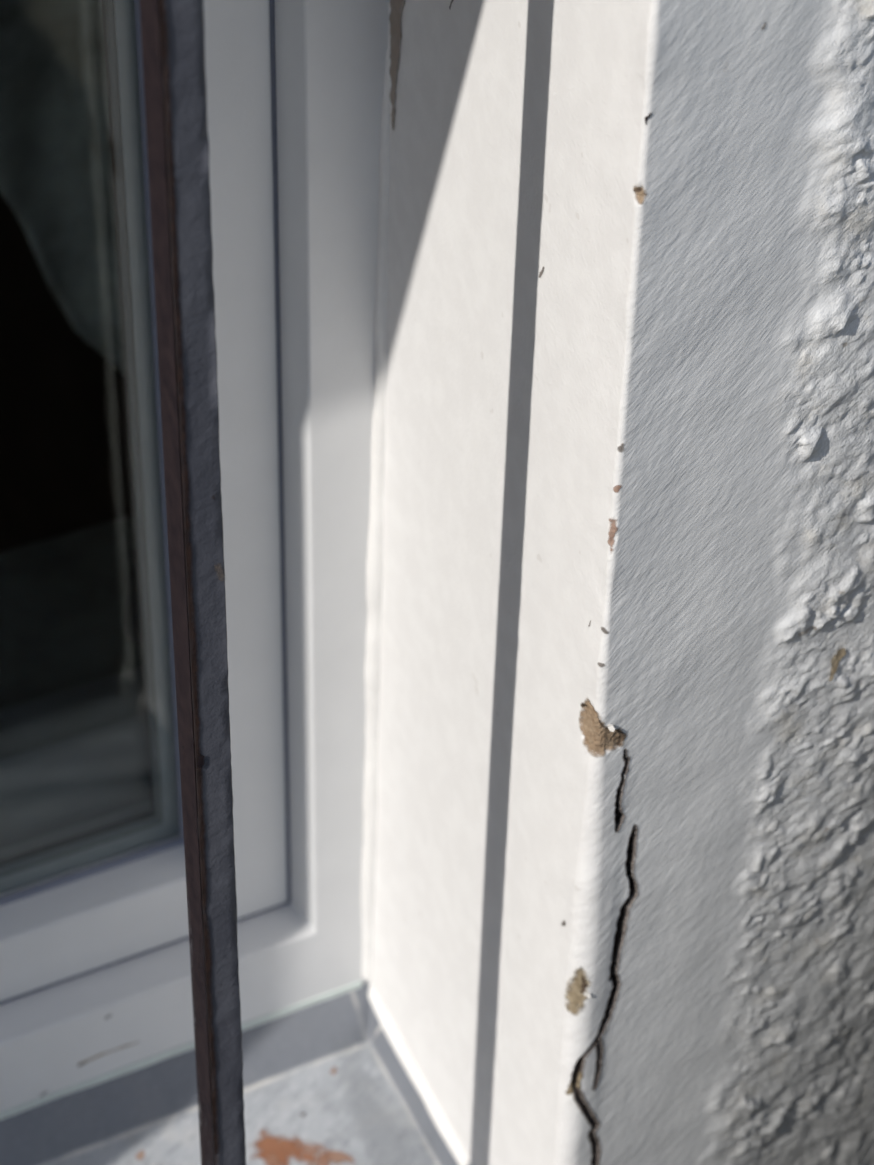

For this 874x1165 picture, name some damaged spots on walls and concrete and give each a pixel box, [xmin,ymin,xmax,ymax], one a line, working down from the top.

peeling [389,0,404,129]
flaking render [579,699,626,756]
crack [566,749,639,1165]
flaking render [566,968,591,1015]
rust [253,1131,354,1165]